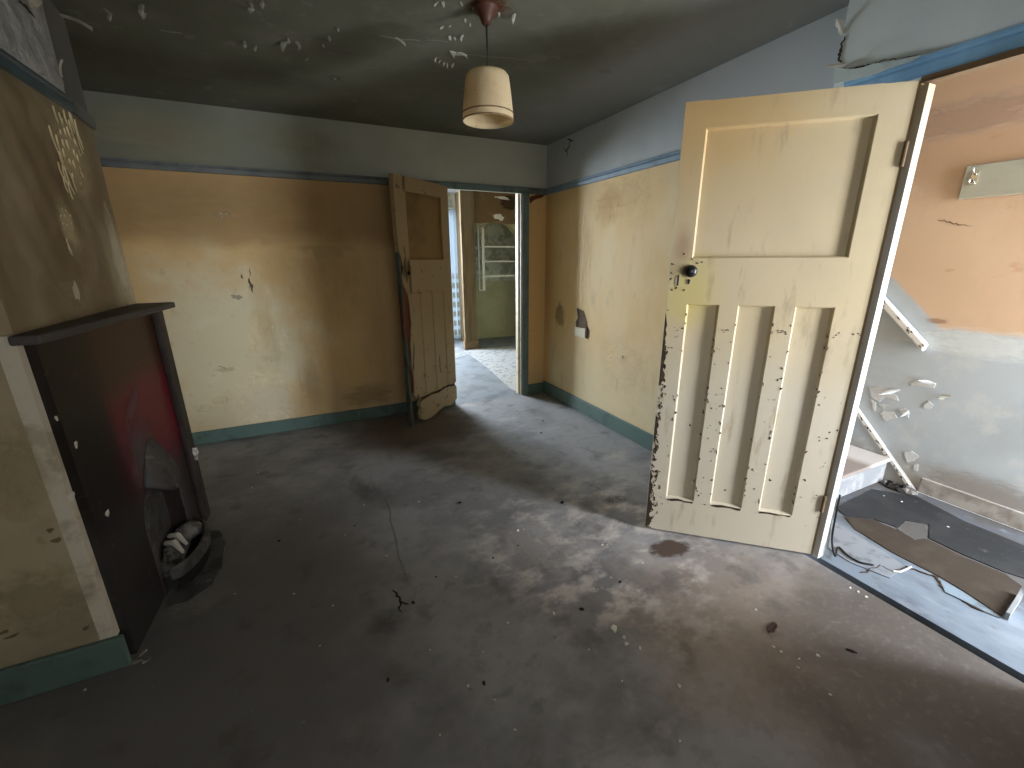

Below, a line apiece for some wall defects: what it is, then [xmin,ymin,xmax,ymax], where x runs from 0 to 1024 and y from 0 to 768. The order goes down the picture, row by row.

peeling [435,2,473,68]
crack [837,36,918,69]
spalling [576,308,588,328]
peeling [870,380,951,421]
leakage [650,540,689,557]
crack [393,590,408,612]